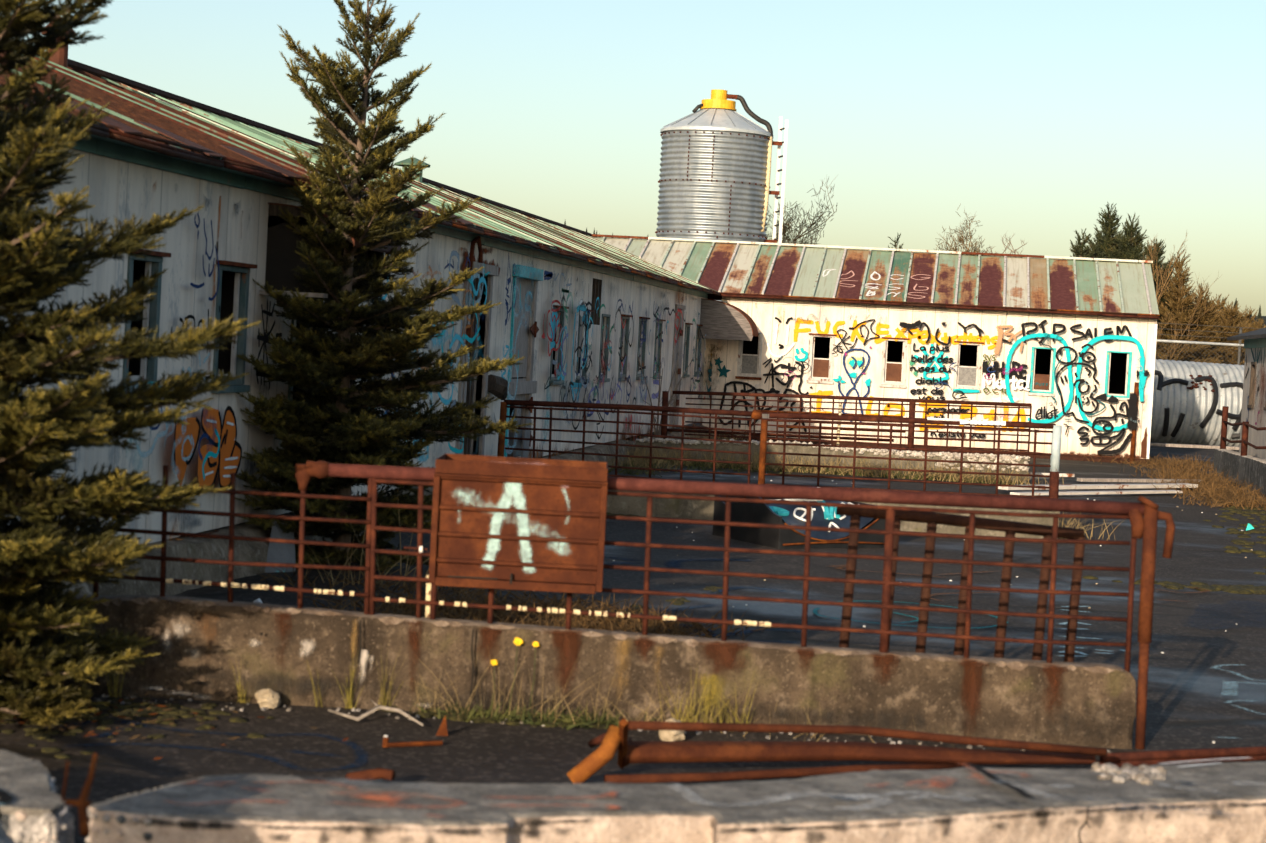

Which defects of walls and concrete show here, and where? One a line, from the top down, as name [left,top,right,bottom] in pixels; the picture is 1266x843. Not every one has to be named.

rust [481,627,501,668]
rust [550,630,580,690]
rust [961,658,984,723]